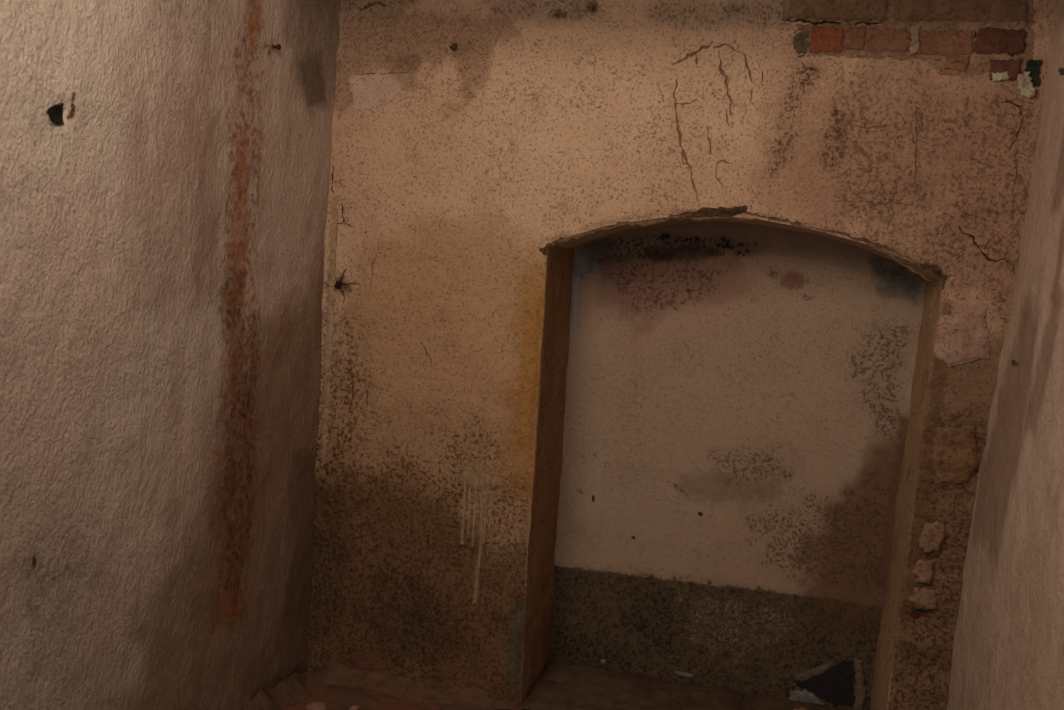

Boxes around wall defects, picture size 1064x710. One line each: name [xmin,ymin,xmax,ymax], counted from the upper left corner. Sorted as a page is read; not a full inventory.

crack [658,41,763,201]
flaking render [769,0,1043,171]
corrosion [211,0,274,620]
damp [572,234,757,331]
damp [154,286,544,710]
damp [548,420,908,710]
damp [889,357,998,710]